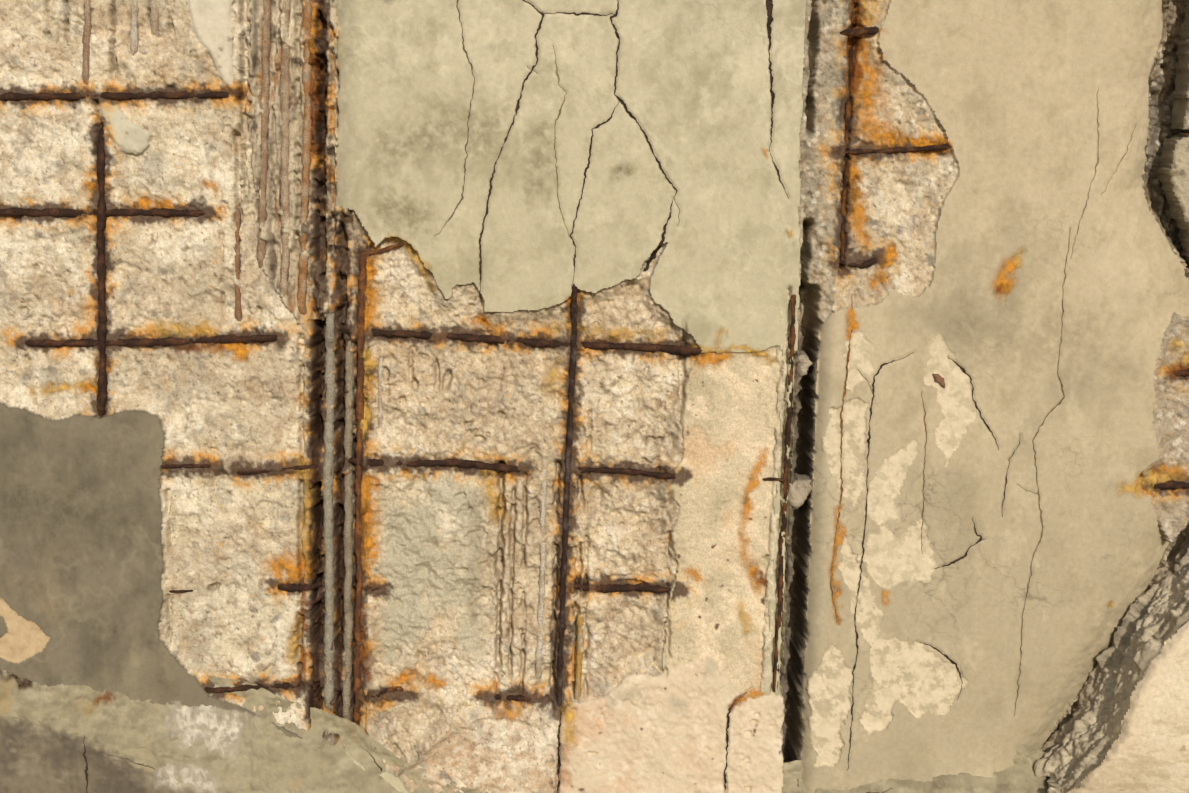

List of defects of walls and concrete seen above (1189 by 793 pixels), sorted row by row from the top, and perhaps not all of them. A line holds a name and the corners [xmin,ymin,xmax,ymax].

crack [437,0,680,302]
crack [766,0,788,196]
spalling [833,0,960,311]
rust [848,0,951,152]
rust [269,327,325,709]
rust [361,476,379,563]
spalling [0,0,813,793]
rust [742,454,765,520]
peeling [805,330,977,768]
crack [921,394,984,570]
crack [948,88,1136,716]
crack [1033,523,1189,793]